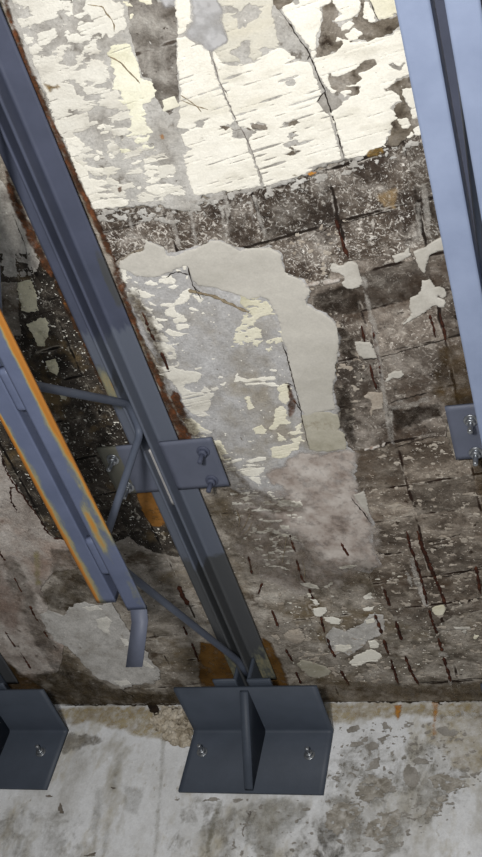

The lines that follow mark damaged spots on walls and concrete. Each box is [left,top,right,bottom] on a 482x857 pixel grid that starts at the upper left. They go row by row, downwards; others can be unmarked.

crack [209,52,262,178]
crack [278,9,344,156]
rust [5,0,191,439]
spalling [0,0,482,685]
rust [287,385,295,416]
rust [435,348,472,404]
rust [198,642,234,687]
rust [262,638,288,686]